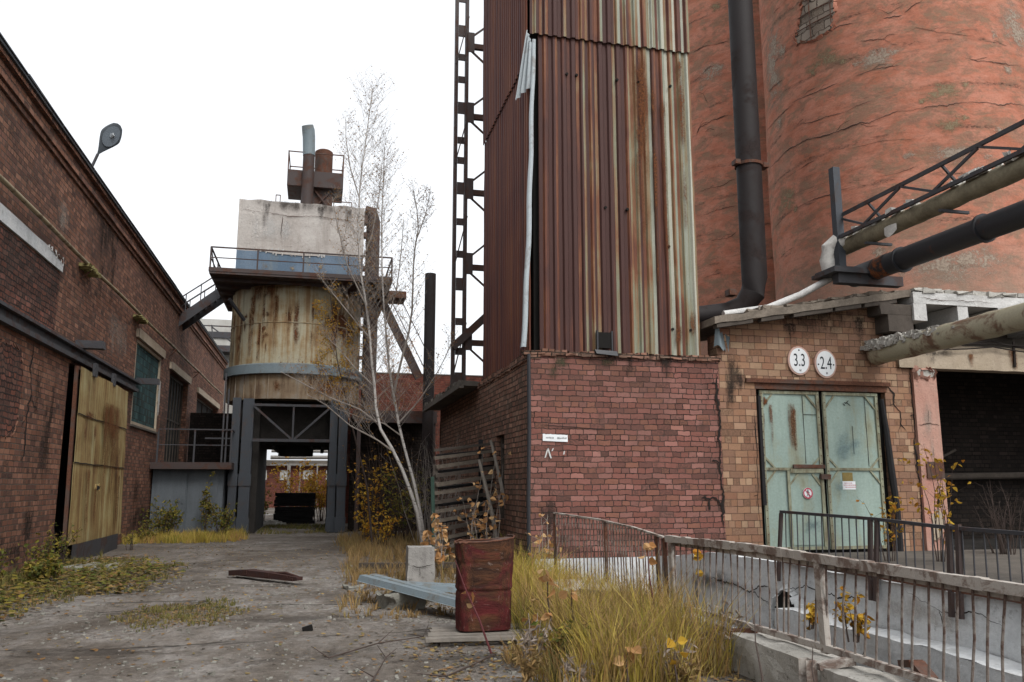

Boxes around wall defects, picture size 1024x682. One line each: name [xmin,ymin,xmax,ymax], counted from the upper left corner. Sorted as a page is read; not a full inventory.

crack [696,41,730,133]
spalling [766,0,900,98]
crack [767,2,1020,175]
leakage [264,201,351,217]
rust [634,56,669,281]
rust [230,286,299,358]
rust [312,305,355,351]
rust [676,316,695,345]
crack [702,363,725,538]
leakage [727,362,742,401]
rust [788,404,796,445]
crack [888,371,940,523]